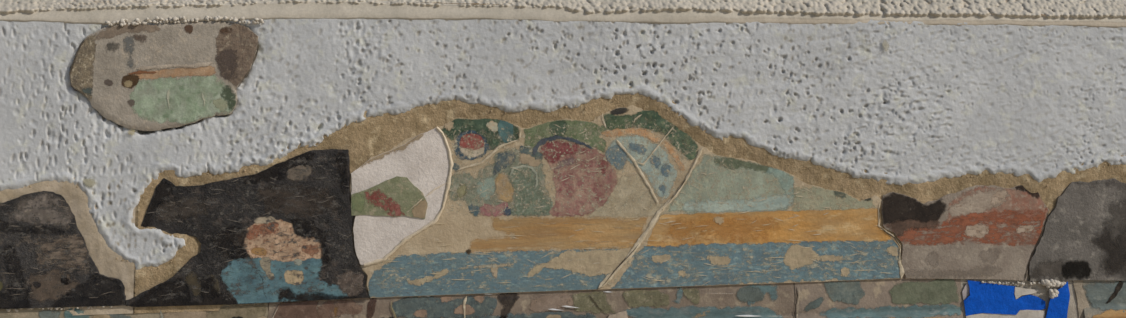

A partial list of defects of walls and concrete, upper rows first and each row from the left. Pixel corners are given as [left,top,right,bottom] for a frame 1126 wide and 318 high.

crack [590,127,703,310]